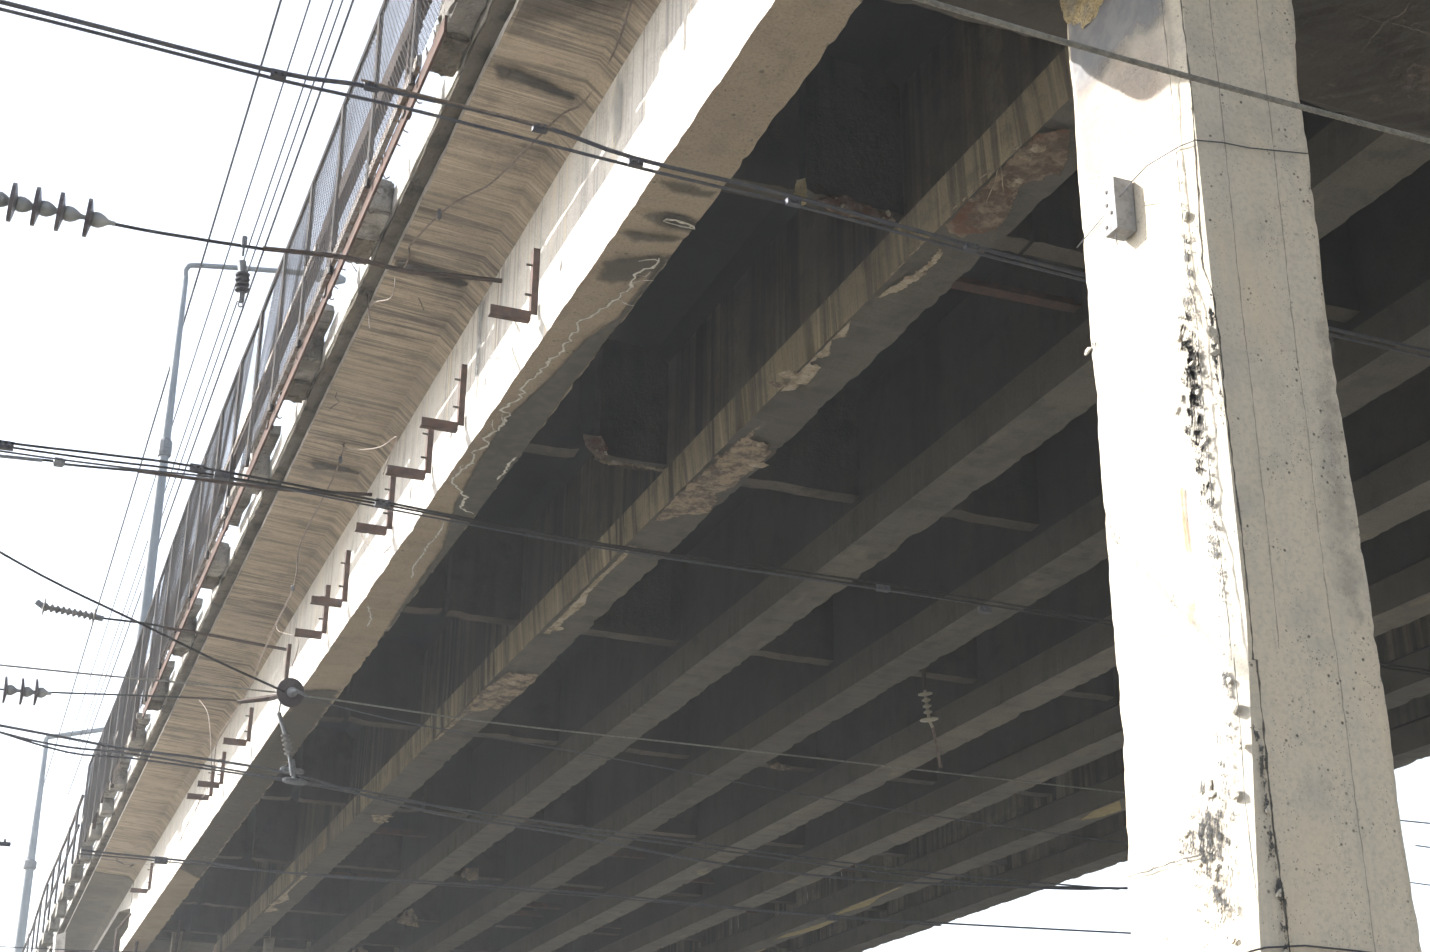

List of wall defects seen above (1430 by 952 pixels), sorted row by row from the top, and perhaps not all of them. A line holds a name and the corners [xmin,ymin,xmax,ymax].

spalling [793,178,896,223]
spalling [944,128,1071,238]
spalling [879,249,943,298]
crack [411,258,660,578]
spalling [656,426,772,521]
crack [1161,0,1290,952]
spalling [434,672,538,740]
crack [1125,850,1215,878]